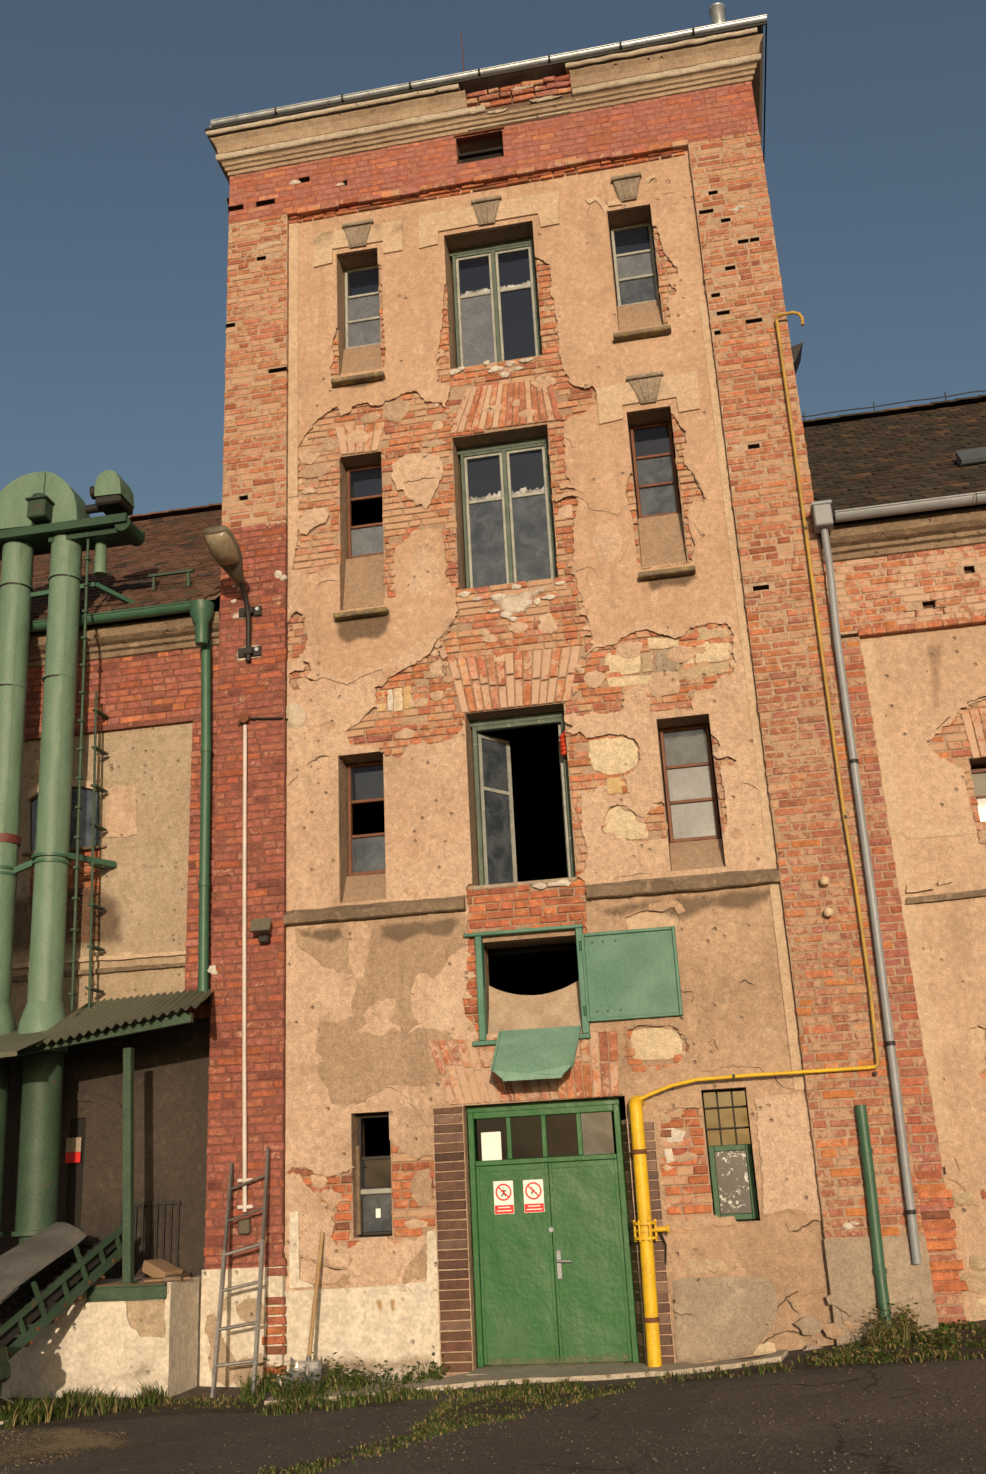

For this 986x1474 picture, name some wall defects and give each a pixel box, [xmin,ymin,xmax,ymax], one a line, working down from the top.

spalling [653,228,683,325]
spalling [287,606,316,691]
flaking render [294,252,736,1106]
spalling [711,736,742,835]
flaking render [925,698,986,849]
flaking render [267,1161,359,1288]
flaking render [389,1141,436,1284]
flaking render [204,1296,287,1387]